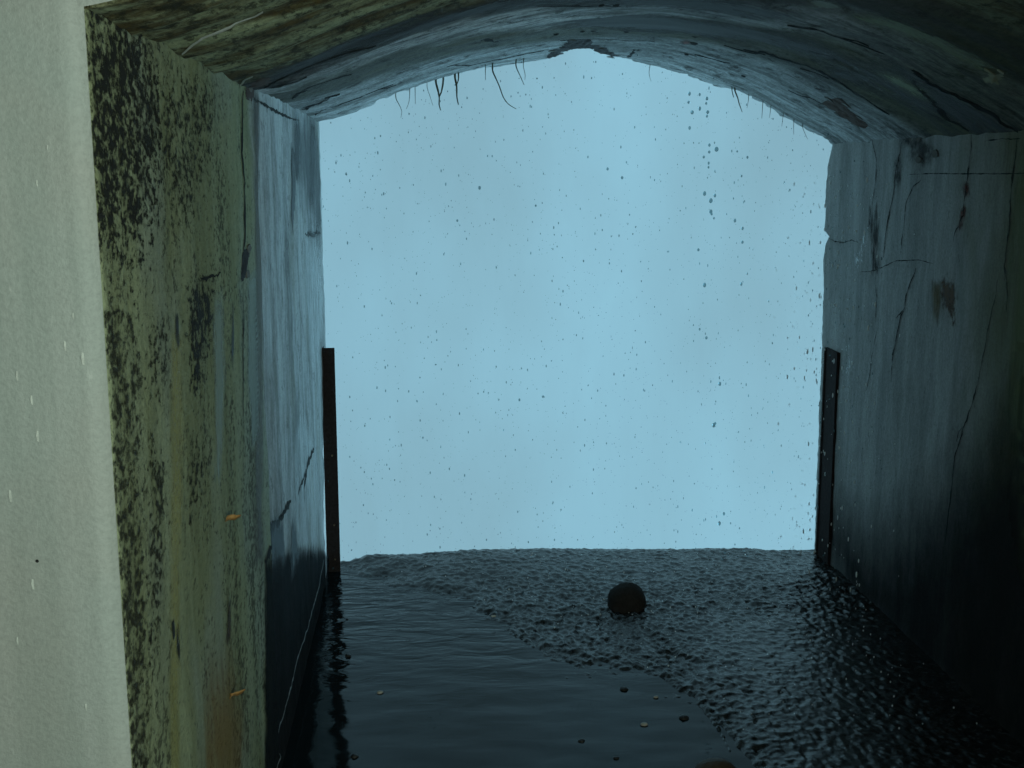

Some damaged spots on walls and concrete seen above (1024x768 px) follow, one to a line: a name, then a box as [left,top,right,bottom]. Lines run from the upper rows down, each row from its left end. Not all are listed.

crack [241,45,396,247]
crack [694,45,890,115]
crack [787,24,885,55]
water stain [86,10,264,768]
crack [200,272,244,417]
crack [862,69,1024,539]
rust [933,278,955,324]